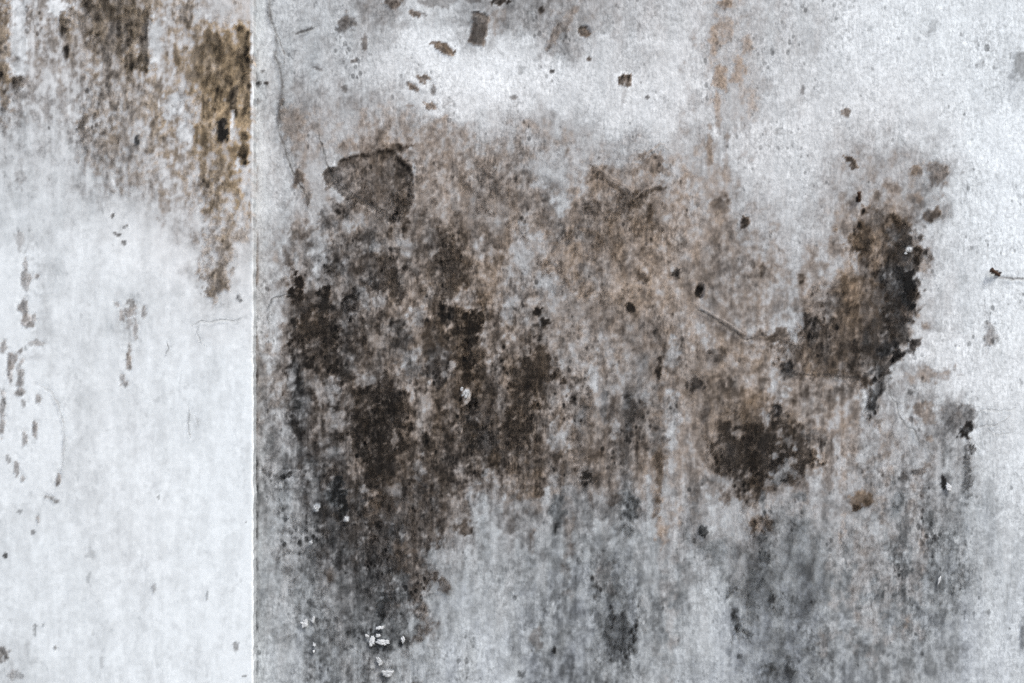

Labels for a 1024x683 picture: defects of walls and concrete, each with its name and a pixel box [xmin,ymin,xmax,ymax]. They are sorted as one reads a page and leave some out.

damp [61,0,158,185]
damp [173,0,268,298]
damp [911,162,947,186]
damp [923,206,941,223]
damp [276,125,727,683]
damp [772,208,931,422]
damp [941,405,973,435]
damp [693,406,829,683]
damp [869,470,965,636]